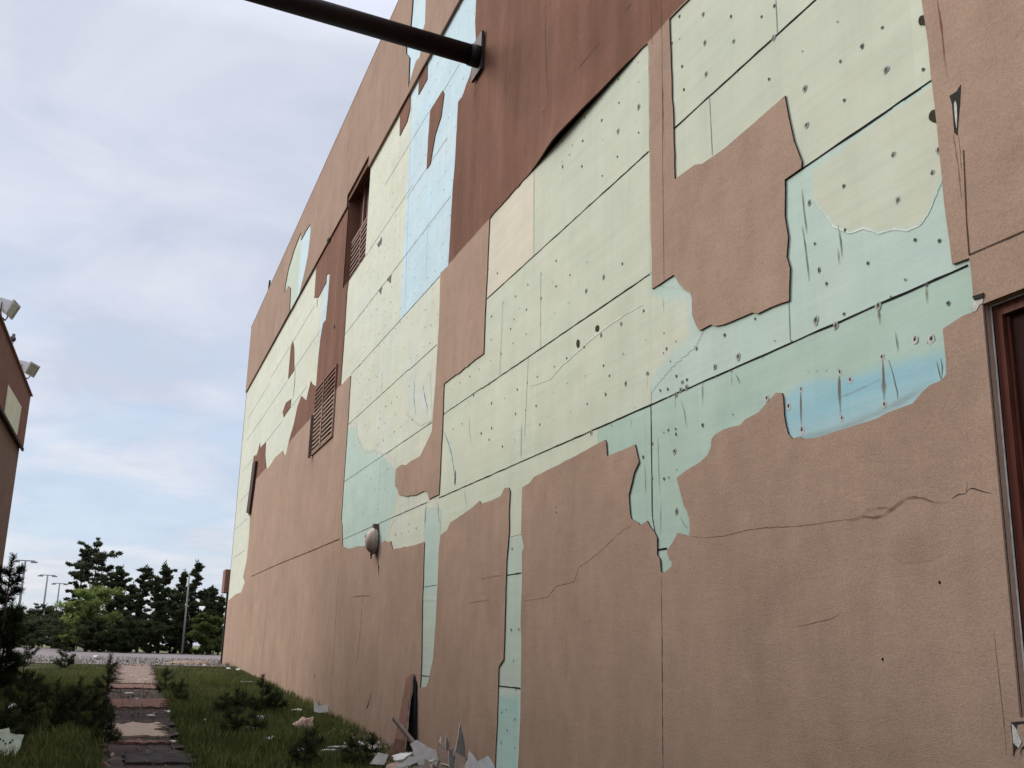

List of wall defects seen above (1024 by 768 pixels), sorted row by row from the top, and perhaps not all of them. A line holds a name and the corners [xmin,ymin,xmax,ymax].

peeling [228,0,984,691]
crack [693,483,989,538]
crack [528,524,633,601]